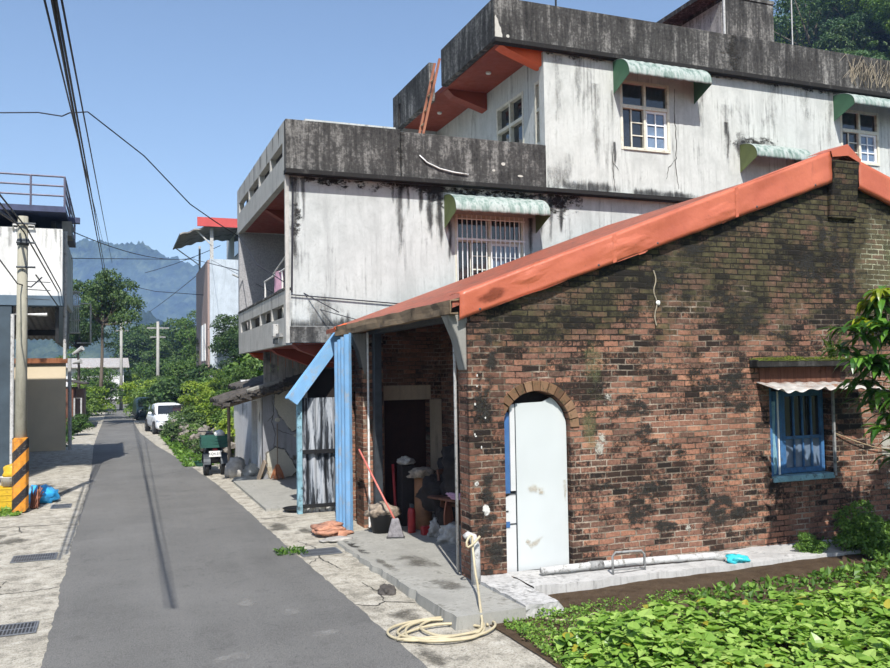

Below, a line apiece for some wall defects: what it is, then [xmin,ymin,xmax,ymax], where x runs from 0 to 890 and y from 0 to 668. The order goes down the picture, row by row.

crack [666,89,679,189]
leakage [724,116,778,154]
leakage [290,172,611,256]
leakage [634,188,689,198]
peeling [881,433,890,489]
leakage [599,480,757,539]